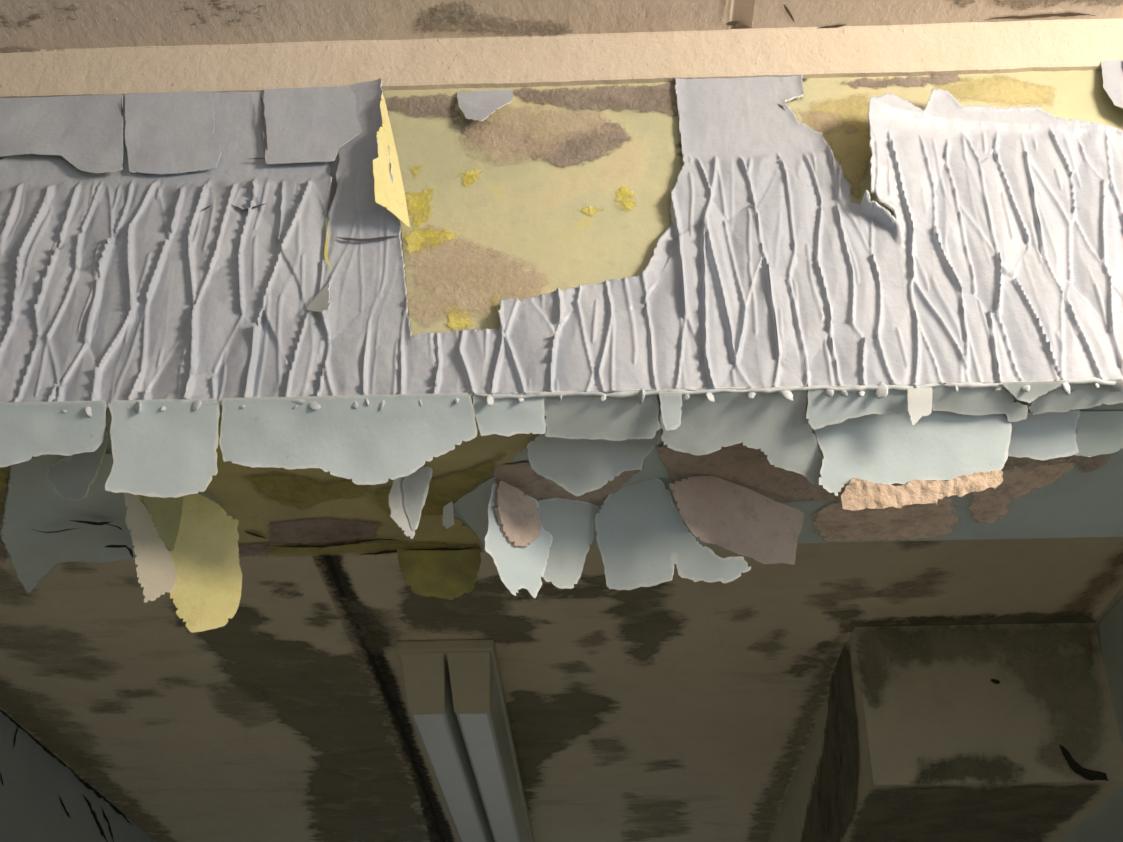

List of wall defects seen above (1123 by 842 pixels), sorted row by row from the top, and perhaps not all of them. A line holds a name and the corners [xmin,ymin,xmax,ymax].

peeling [0,91,221,174]
peeling [262,86,362,164]
peeling [372,82,683,336]
peeling [787,60,1123,204]
peeling [0,380,1123,633]
damp [789,553,1123,677]
damp [198,575,685,842]
damp [816,674,841,835]